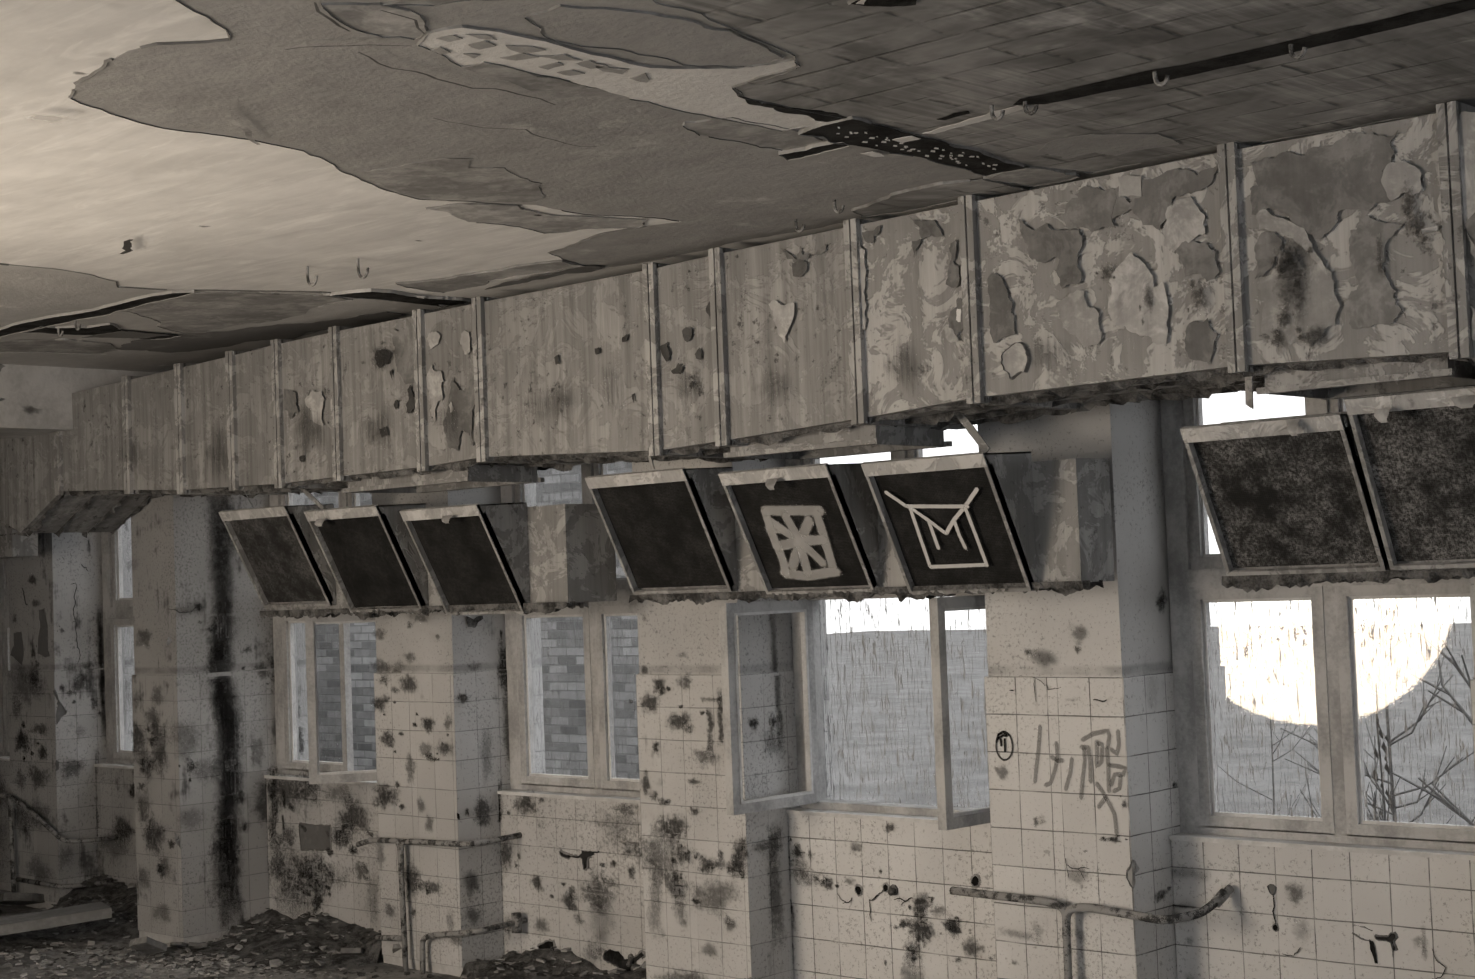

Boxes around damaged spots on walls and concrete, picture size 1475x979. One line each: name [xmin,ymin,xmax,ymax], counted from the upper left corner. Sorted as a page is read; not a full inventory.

crack [285,2,597,147]
peeling [912,219,963,343]
peeling [1056,253,1169,348]
peeling [1163,196,1206,250]
peeling [1256,209,1340,346]
peeling [1381,159,1442,234]
peeling [1459,111,1475,257]
damp [130,724,195,796]
damp [199,497,432,916]
mould [629,667,724,763]
damp [116,817,174,876]
damp [643,771,839,927]